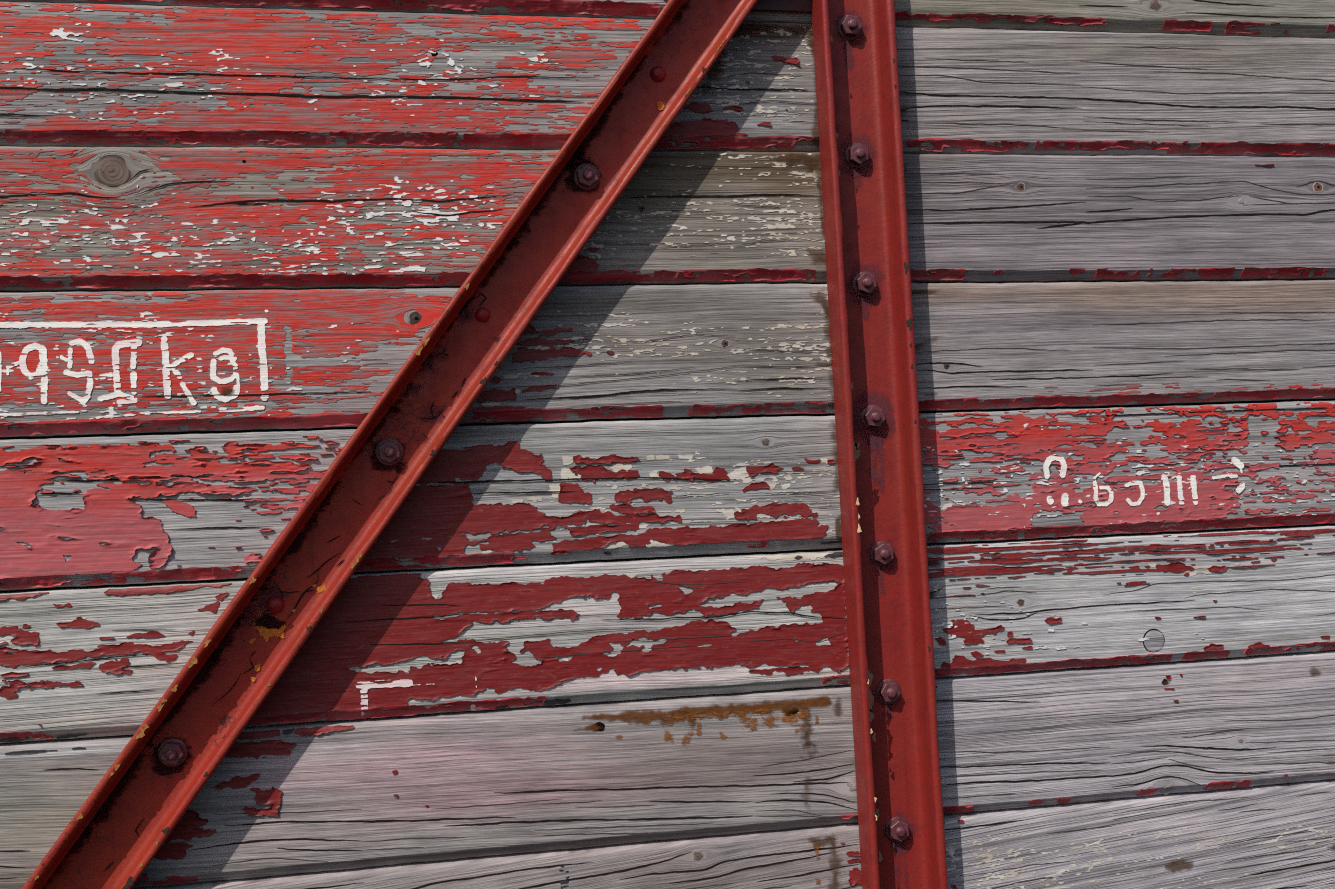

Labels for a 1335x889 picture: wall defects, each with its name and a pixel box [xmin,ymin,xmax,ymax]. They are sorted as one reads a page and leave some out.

peeling [772,55,801,67]
peeling [655,102,819,150]
peeling [560,248,816,284]
peeling [0,0,663,699]
peeling [687,401,828,416]
rust [34,55,647,889]
peeling [919,380,1335,597]
peeling [215,441,850,816]
peeling [0,724,52,739]
rust [583,696,840,748]
peeling [153,809,216,860]
peeling [841,842,862,886]